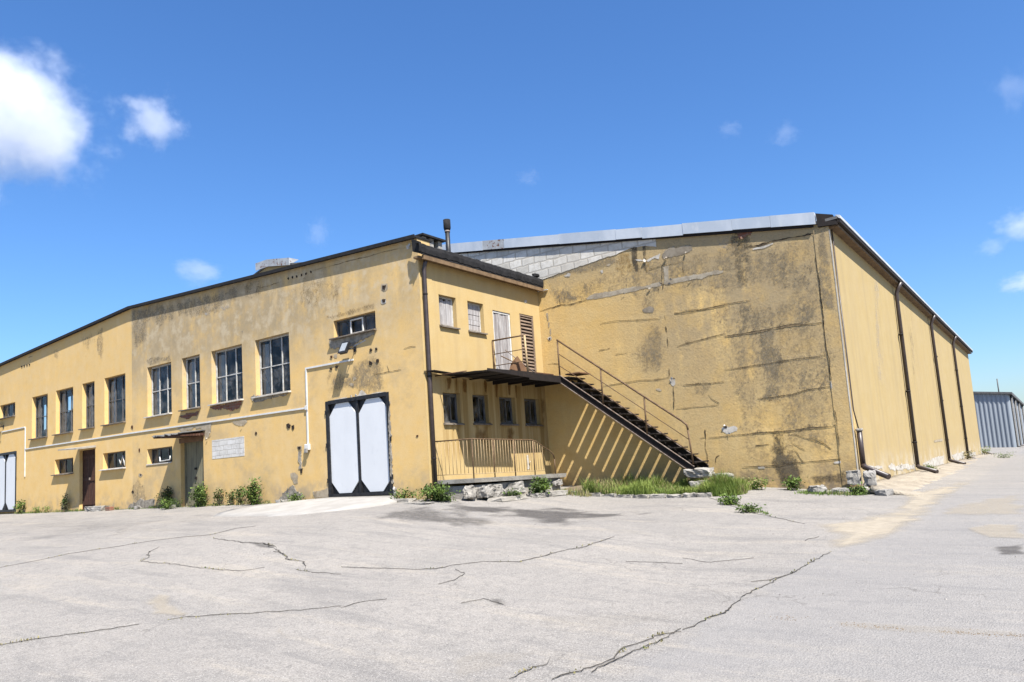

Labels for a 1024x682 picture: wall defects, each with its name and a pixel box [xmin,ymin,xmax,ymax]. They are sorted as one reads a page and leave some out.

spalling [586,245,723,300]
crack [544,233,841,467]
water stain [552,232,834,437]
water stain [773,437,800,487]